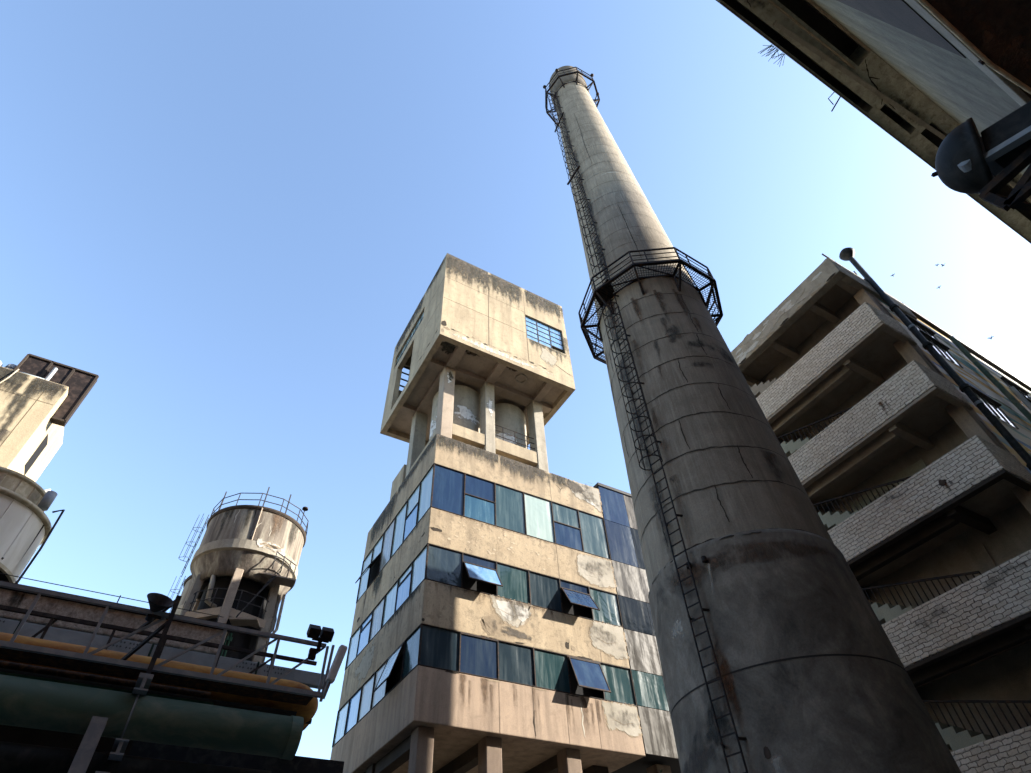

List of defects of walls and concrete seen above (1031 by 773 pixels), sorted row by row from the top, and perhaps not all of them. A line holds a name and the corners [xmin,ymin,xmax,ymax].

damp [397,253,563,348]
damp [0,366,66,441]
damp [371,416,584,540]
damp [272,514,298,542]
flaking render [575,553,617,589]
flaking render [481,594,533,644]
flaking render [546,620,629,660]